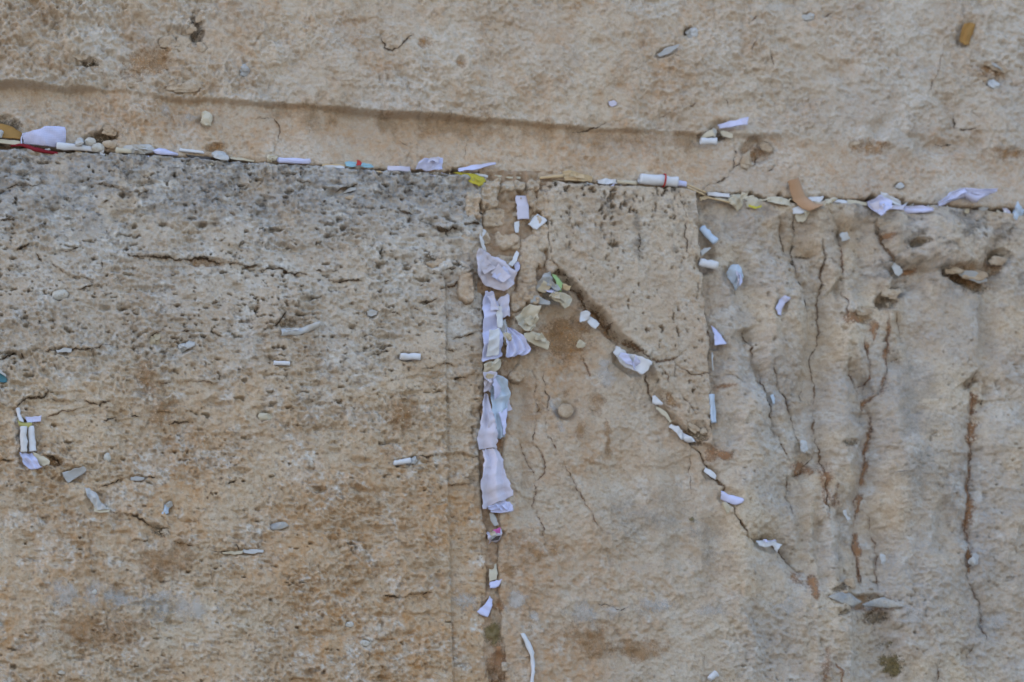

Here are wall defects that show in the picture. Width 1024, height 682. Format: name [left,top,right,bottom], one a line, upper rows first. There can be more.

crack [876,227,895,262]
crack [521,378,596,534]
crack [736,223,849,505]
crack [848,288,900,468]
crack [853,499,878,584]